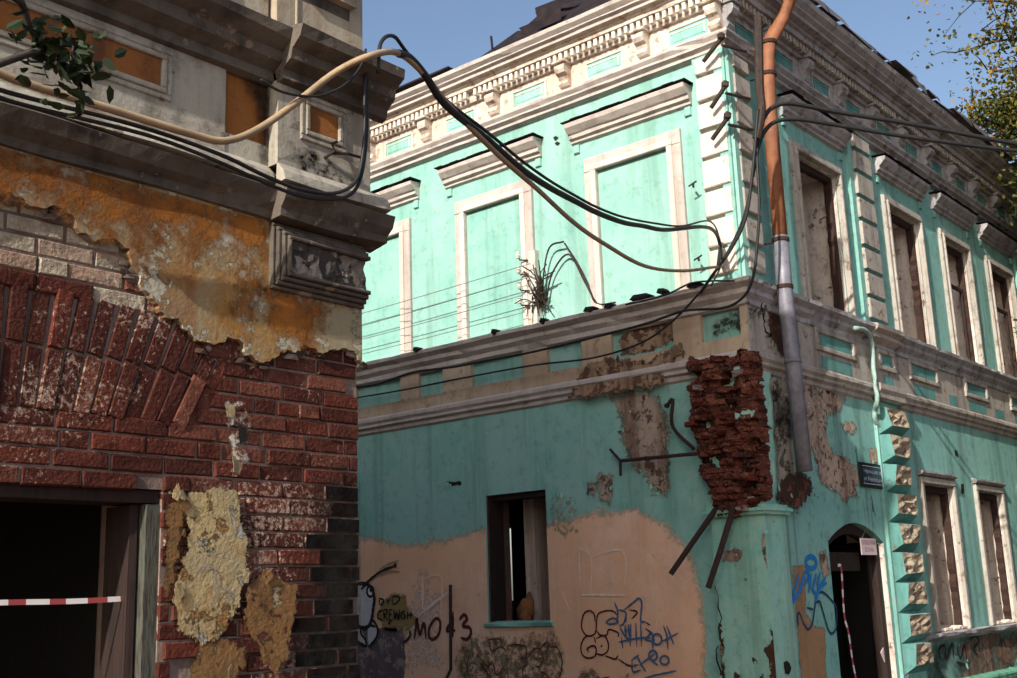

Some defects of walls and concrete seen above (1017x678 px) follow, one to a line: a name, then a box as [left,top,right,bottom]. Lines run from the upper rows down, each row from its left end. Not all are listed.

peeling [119,261,139,284]
peeling [284,349,325,360]
peeling [345,351,368,369]
spalling [569,322,860,519]
peeling [717,623,741,678]
peeling [752,630,776,678]